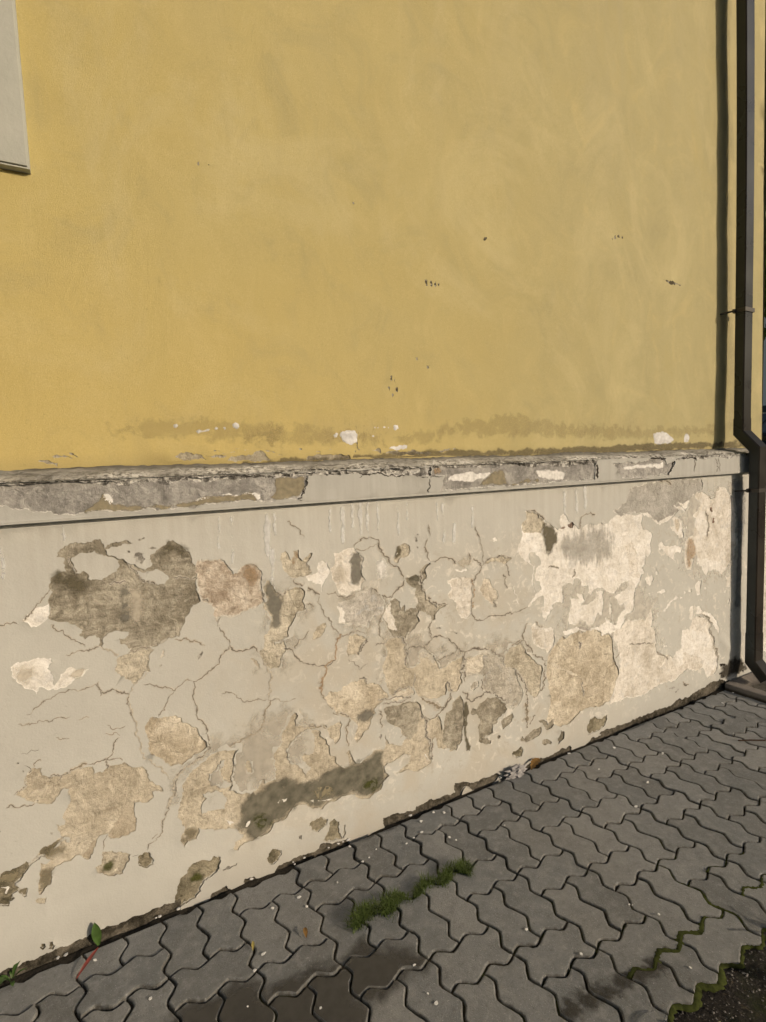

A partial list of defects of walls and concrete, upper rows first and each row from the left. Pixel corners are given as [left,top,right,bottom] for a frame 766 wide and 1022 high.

flaking render [0,448,599,516]
flaking render [372,445,423,454]
damp [267,441,743,463]
crack [423,525,484,566]
peeling [11,657,90,694]
flaking render [22,537,312,693]
crack [6,536,547,850]
flaking render [145,454,746,871]
flaking render [0,762,163,907]
flaking render [0,856,237,982]